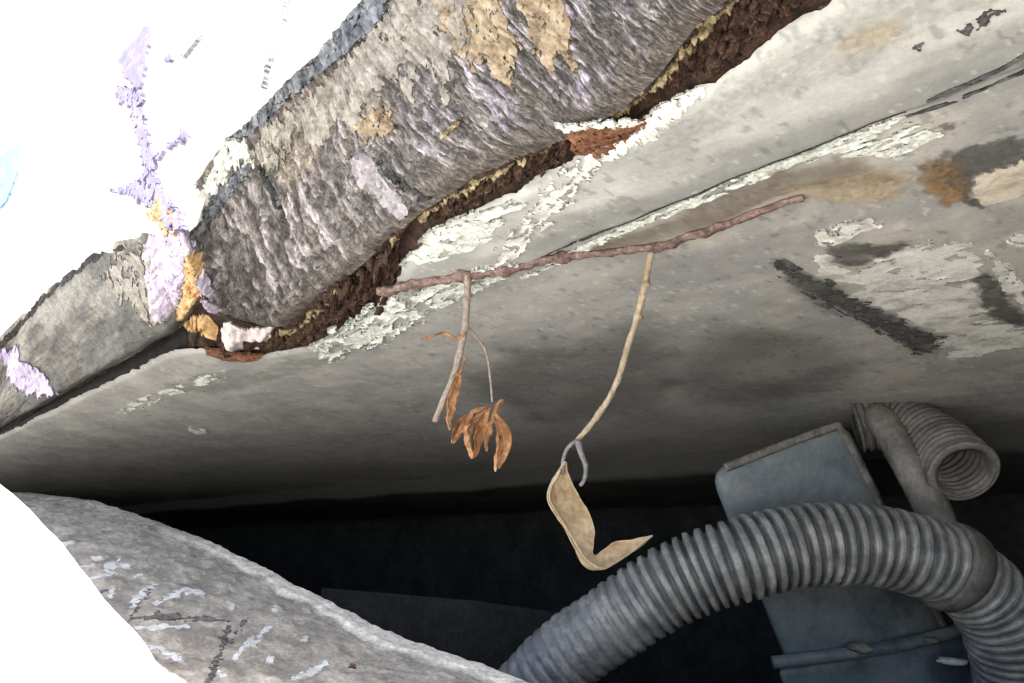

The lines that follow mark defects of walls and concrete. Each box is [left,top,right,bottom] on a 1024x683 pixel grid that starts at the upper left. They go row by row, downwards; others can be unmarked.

peeling [100,0,602,364]
corrosion [184,0,832,363]
peeling [566,115,944,253]
corrosion [917,160,970,207]
damp [590,225,669,251]
damp [782,265,943,352]
damp [830,243,909,266]
peeling [773,216,1024,360]
crack [126,585,249,683]